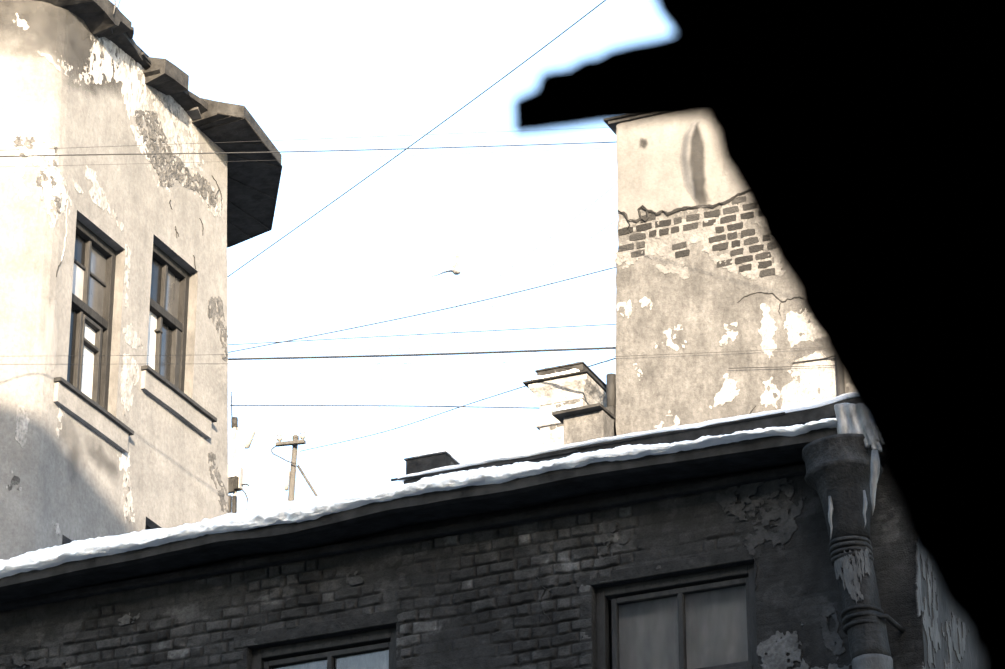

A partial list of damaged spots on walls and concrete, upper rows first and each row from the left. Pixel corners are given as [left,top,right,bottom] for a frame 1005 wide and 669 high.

spalling [37,35,223,217]
peeling [1,109,124,231]
water stain [695,179,707,205]
flaking render [614,195,784,280]
peeling [709,373,740,409]
peeling [758,303,837,409]
peeling [756,603,852,669]
peeling [834,546,870,604]
peeling [915,551,970,669]